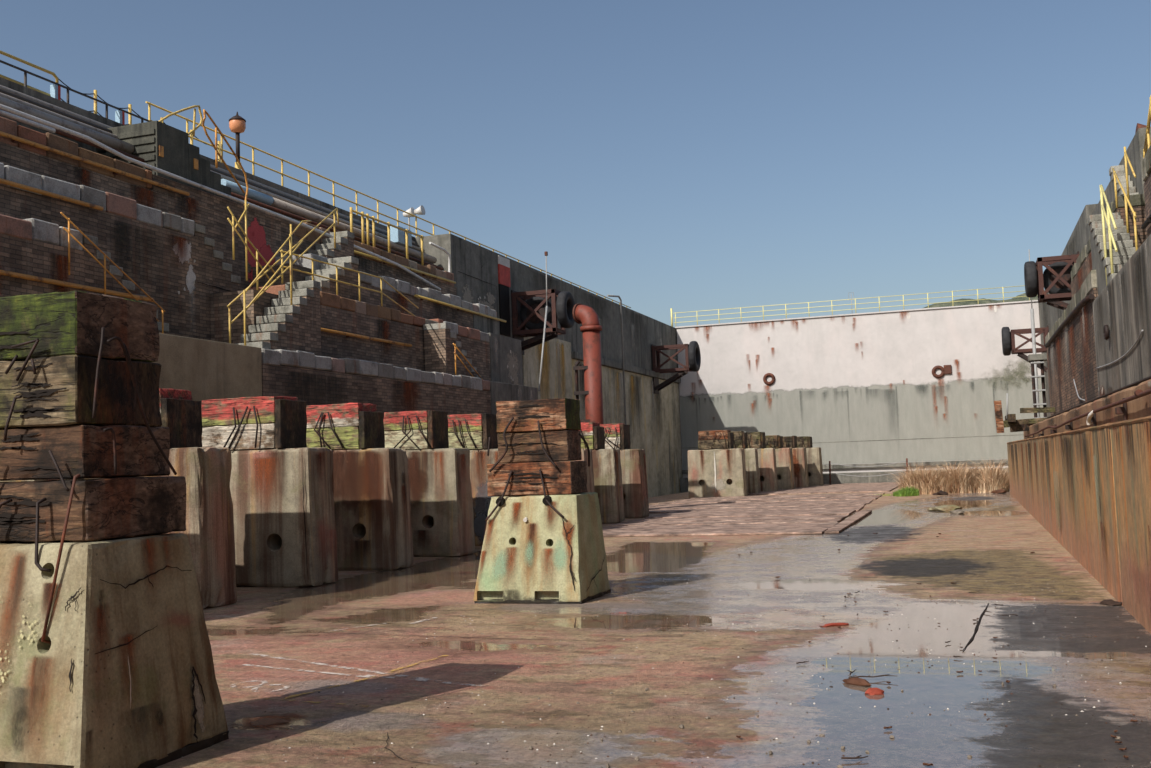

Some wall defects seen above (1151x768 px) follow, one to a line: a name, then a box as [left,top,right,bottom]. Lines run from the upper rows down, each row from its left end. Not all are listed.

peeling [172,240,196,294]
corrosion [256,451,284,485]
corrosion [318,451,443,517]
corrosion [481,519,493,564]
corrosion [507,548,516,568]
corrosion [563,523,573,551]
corrosion [4,555,22,632]
corrosion [44,583,58,602]
crack [65,565,192,611]
crack [192,666,206,743]